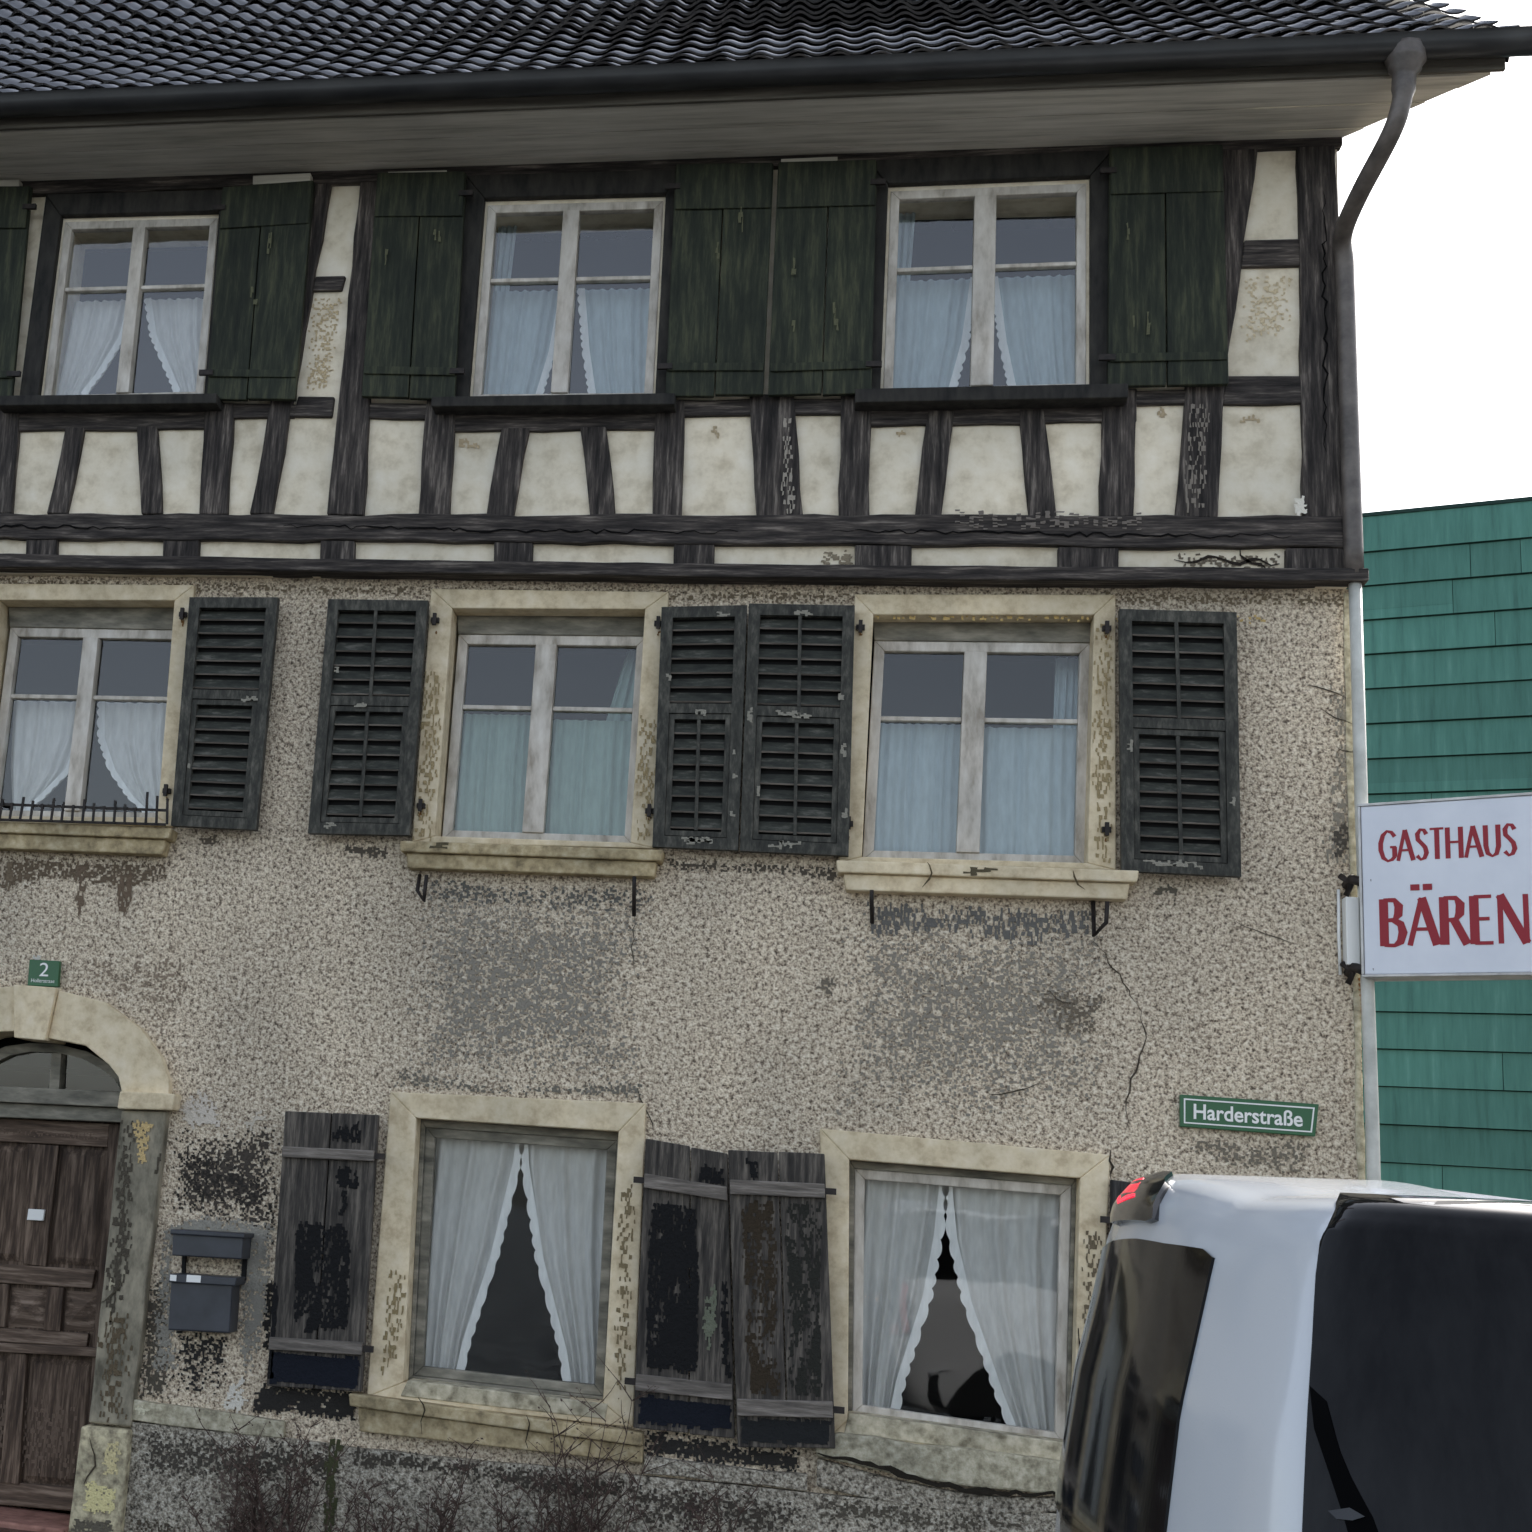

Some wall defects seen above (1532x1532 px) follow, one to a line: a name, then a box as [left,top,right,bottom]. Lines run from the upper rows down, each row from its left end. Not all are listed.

leakage [0,856,170,916]
leakage [154,1127,280,1245]
leakage [97,1120,227,1423]
leakage [262,1280,273,1350]